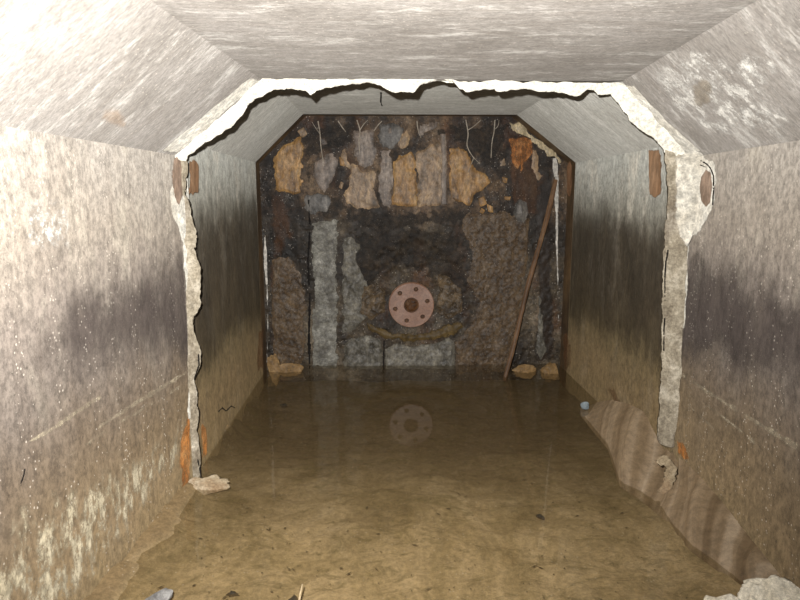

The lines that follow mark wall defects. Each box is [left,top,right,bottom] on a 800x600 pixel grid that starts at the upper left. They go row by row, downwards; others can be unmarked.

spalling [164,78,716,478]
water stain [682,264,800,366]
rust [180,419,190,485]